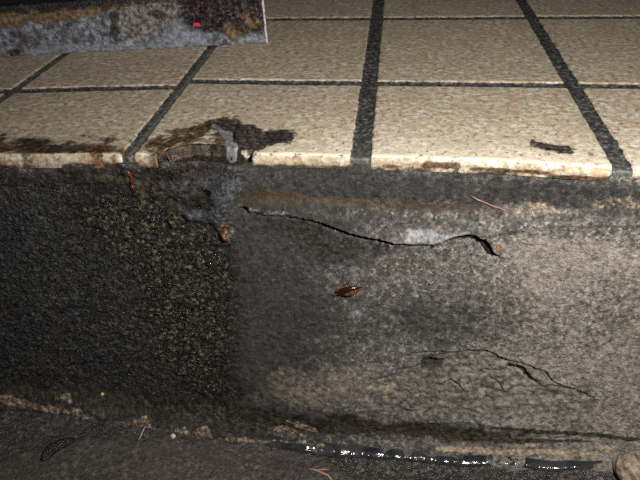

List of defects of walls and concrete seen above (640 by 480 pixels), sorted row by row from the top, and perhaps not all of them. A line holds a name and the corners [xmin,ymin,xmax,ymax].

crack [248,208,390,256]
crack [405,229,496,256]
damp [0,166,640,444]